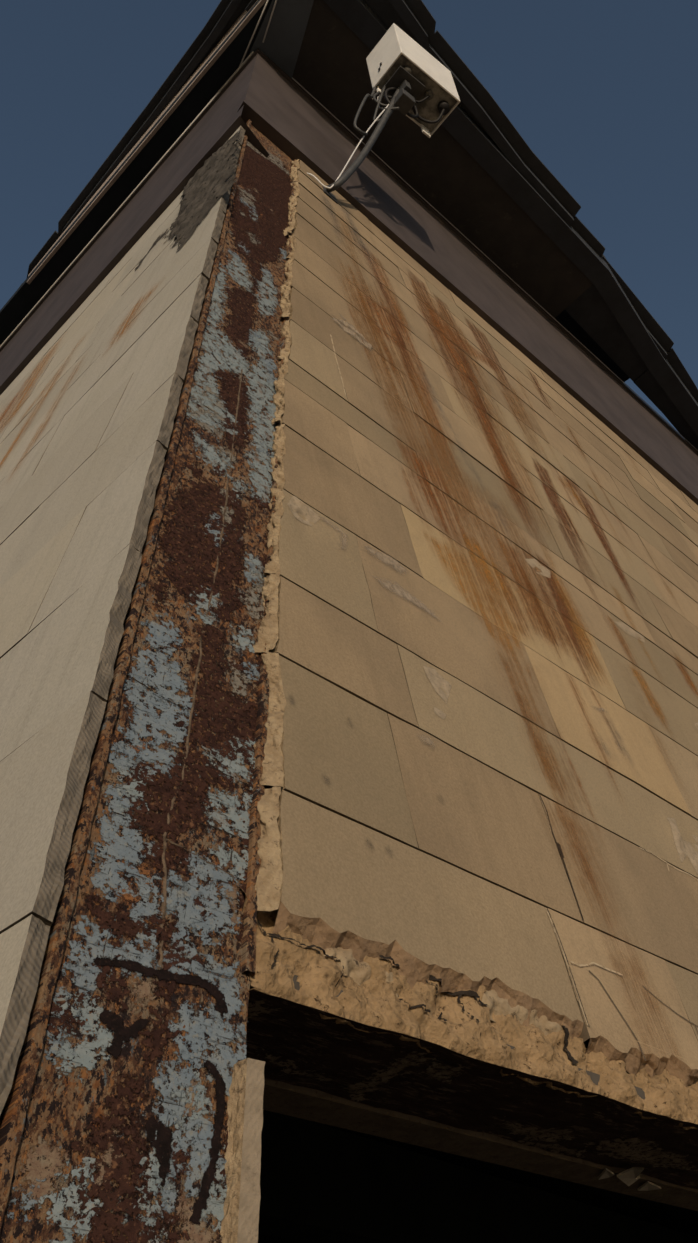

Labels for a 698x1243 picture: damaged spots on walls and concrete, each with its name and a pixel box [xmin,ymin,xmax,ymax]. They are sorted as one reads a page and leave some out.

spalling [135,128,260,271]
rust [213,143,292,452]
spalling [186,140,698,1130]
rust [348,248,597,676]
rust [535,464,628,586]
rust [20,459,271,1243]
peeling [41,614,253,1243]
crack [539,794,698,1064]
peeling [7,1157,104,1243]
peeling [598,1167,661,1191]